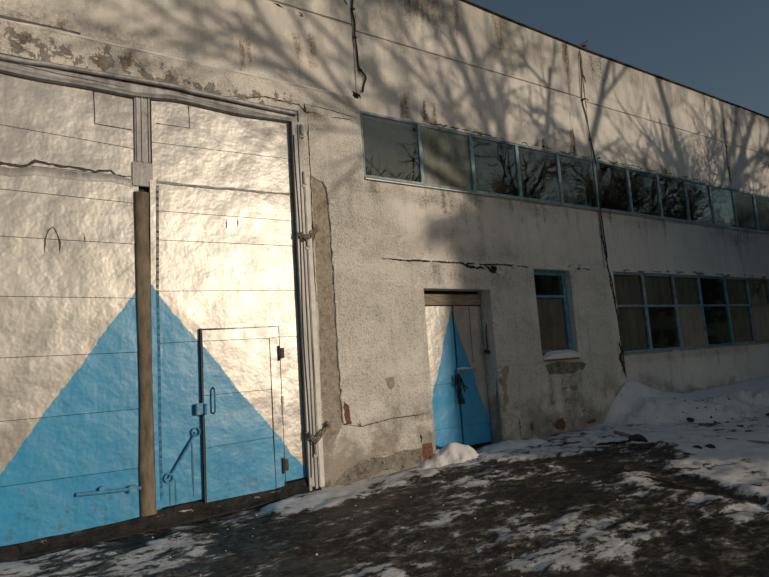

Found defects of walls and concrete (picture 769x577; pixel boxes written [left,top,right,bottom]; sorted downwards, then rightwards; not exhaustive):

peeling [0,22,293,105]
crack [581,57,589,107]
crack [722,109,731,182]
flaking render [312,175,352,455]
crack [599,212,626,376]
spalling [545,361,586,375]
flaking render [334,434,433,486]